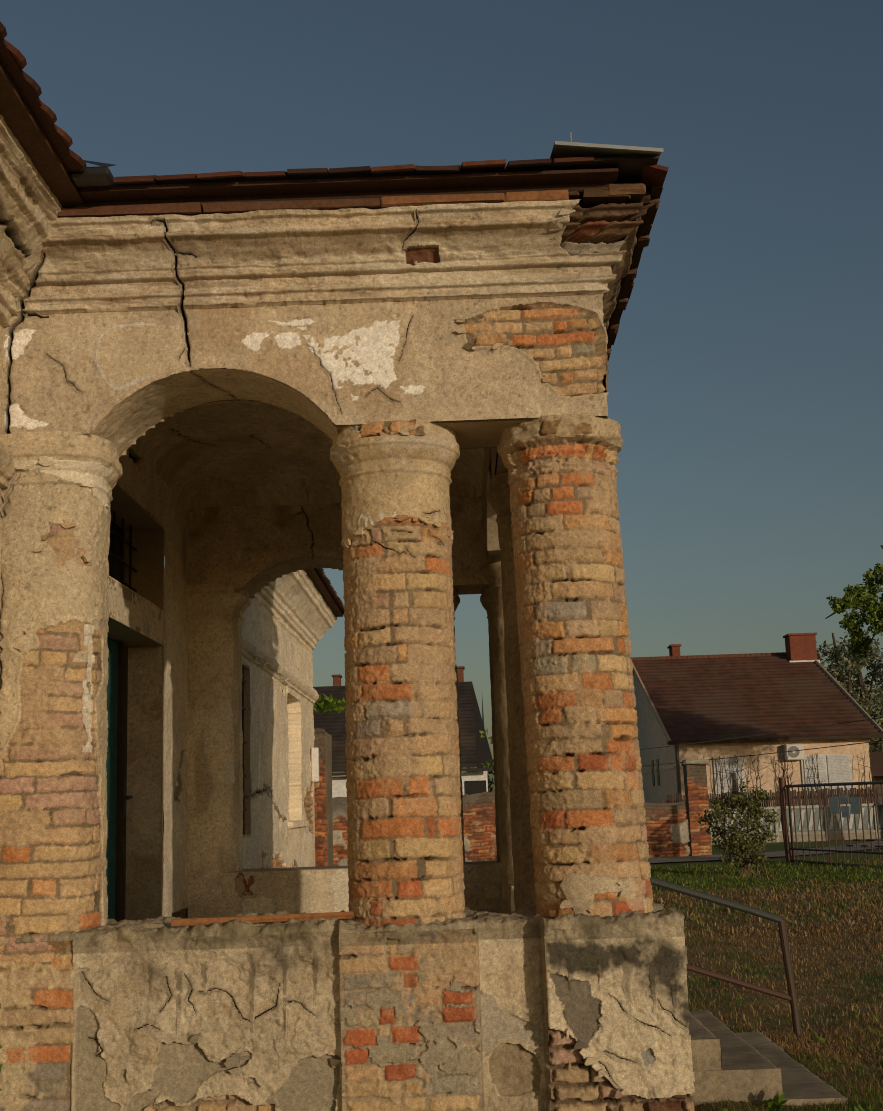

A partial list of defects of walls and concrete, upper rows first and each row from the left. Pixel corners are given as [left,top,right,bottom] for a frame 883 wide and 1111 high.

flaking render [537,202,654,256]
crack [0,193,48,434]
crack [44,353,83,395]
crack [149,217,237,399]
peeling [242,318,426,400]
flaking render [454,302,608,397]
flaking render [501,420,654,919]
flaking render [0,595,105,1111]
crack [245,784,286,823]
flaking render [339,511,694,1111]
crack [80,972,110,1005]
crack [133,973,317,1033]